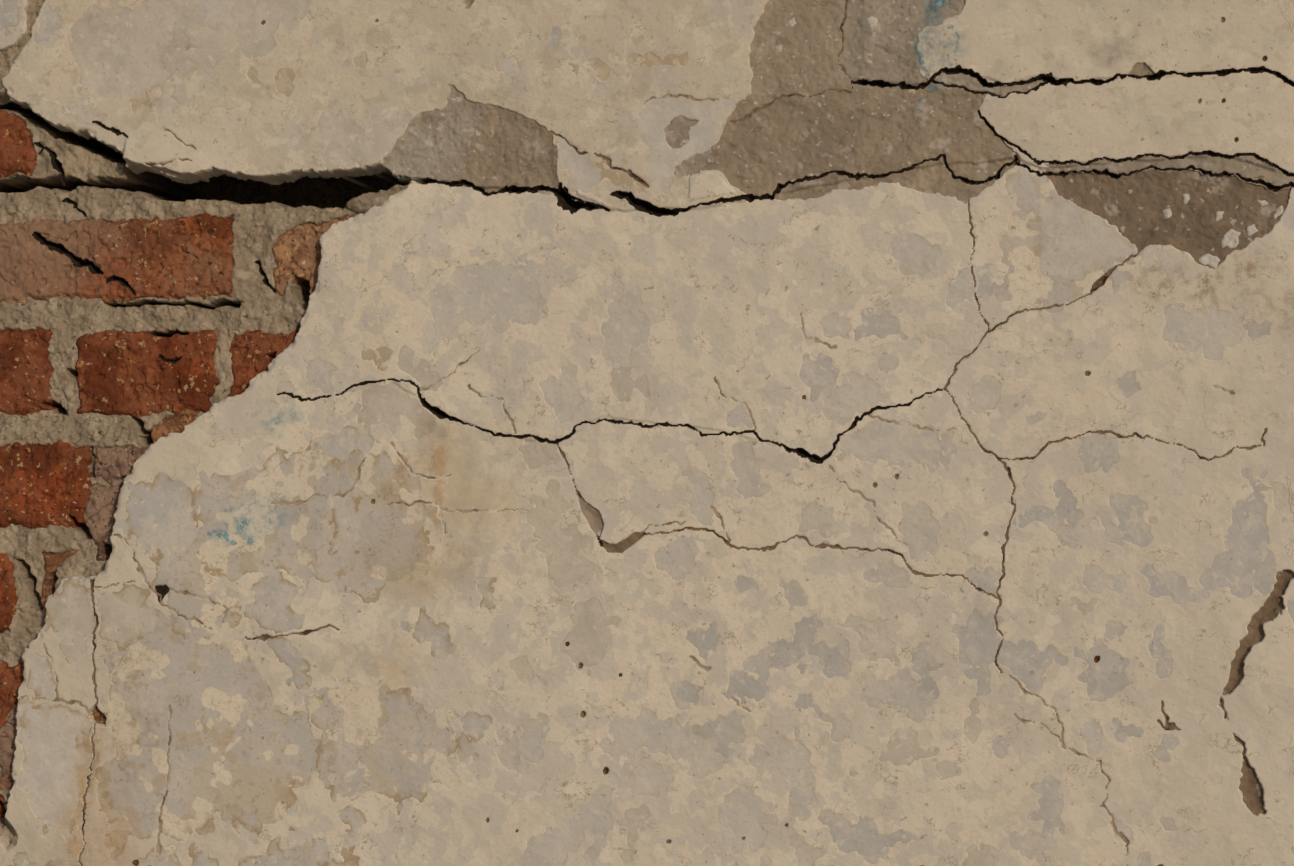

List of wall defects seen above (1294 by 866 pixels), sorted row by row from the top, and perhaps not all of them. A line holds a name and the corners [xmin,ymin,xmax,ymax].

crack [92,121,196,166]
peeling [6,253,546,866]
crack [270,0,1294,866]
spalling [309,0,1294,314]